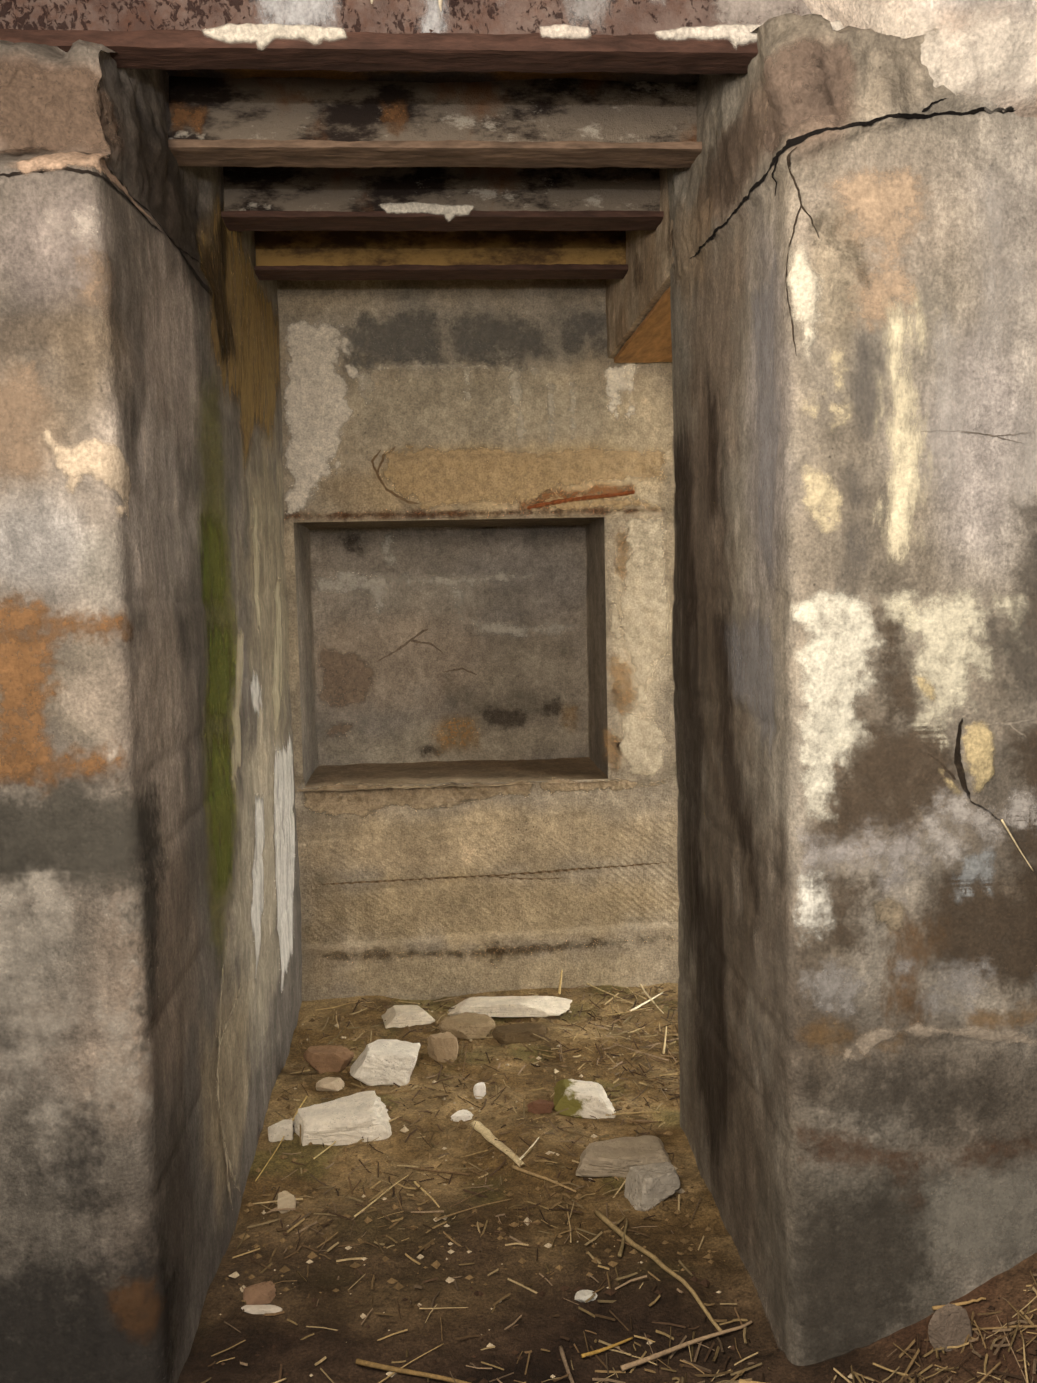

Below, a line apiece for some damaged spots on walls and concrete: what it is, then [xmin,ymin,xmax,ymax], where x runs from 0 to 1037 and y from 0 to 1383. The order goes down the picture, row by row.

efflorescence [203,0,346,48]
efflorescence [423,0,443,33]
efflorescence [540,0,602,38]
crack [0,152,213,298]
crack [691,98,1016,353]
peeling [284,321,364,514]
corrosion [318,485,655,519]
leakage [805,474,840,531]
corrosion [0,597,133,785]
leakage [793,506,1037,1023]
crack [948,718,1037,821]